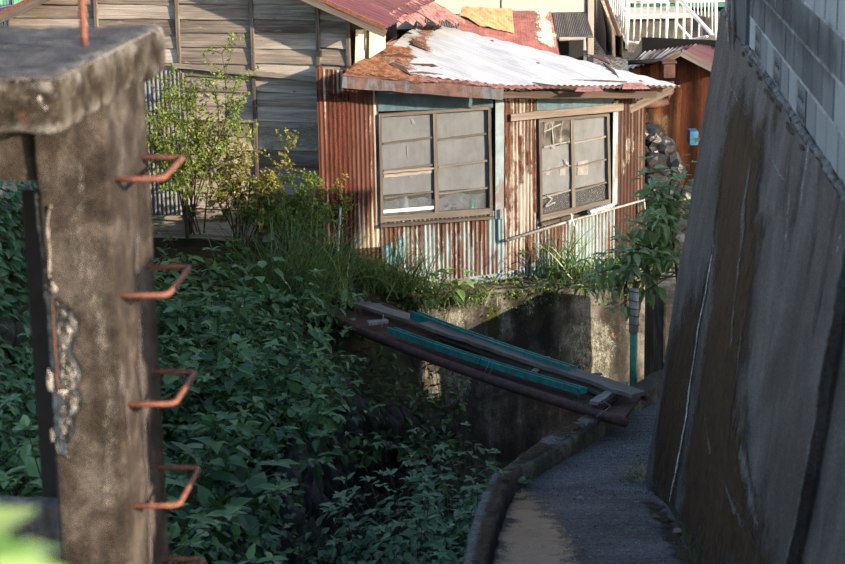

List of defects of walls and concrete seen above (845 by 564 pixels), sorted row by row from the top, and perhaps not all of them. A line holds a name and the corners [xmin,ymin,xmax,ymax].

rust [346,25,560,89]
rust [327,92,359,240]
rust [504,101,538,259]
spalling [44,285,81,458]
damp [510,295,529,350]
damp [613,297,630,381]
damp [640,73,777,564]